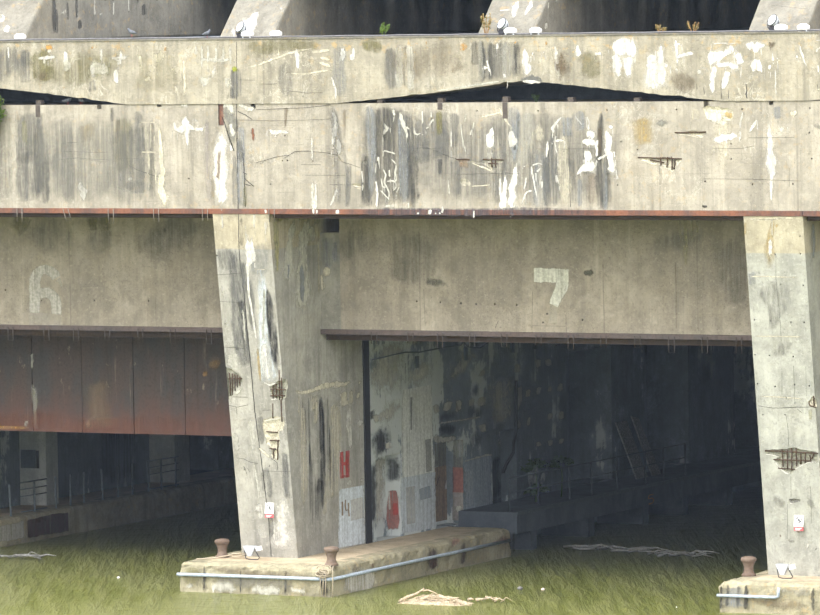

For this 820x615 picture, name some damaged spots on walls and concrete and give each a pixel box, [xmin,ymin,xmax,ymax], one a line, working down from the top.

water stain [361,108,474,207]
water stain [534,118,571,204]
water stain [596,114,609,207]
spalling [638,156,682,172]
water stain [222,183,328,380]
spalling [226,367,243,399]
spalling [263,370,288,460]
water stain [388,459,401,480]
spalling [763,448,820,474]